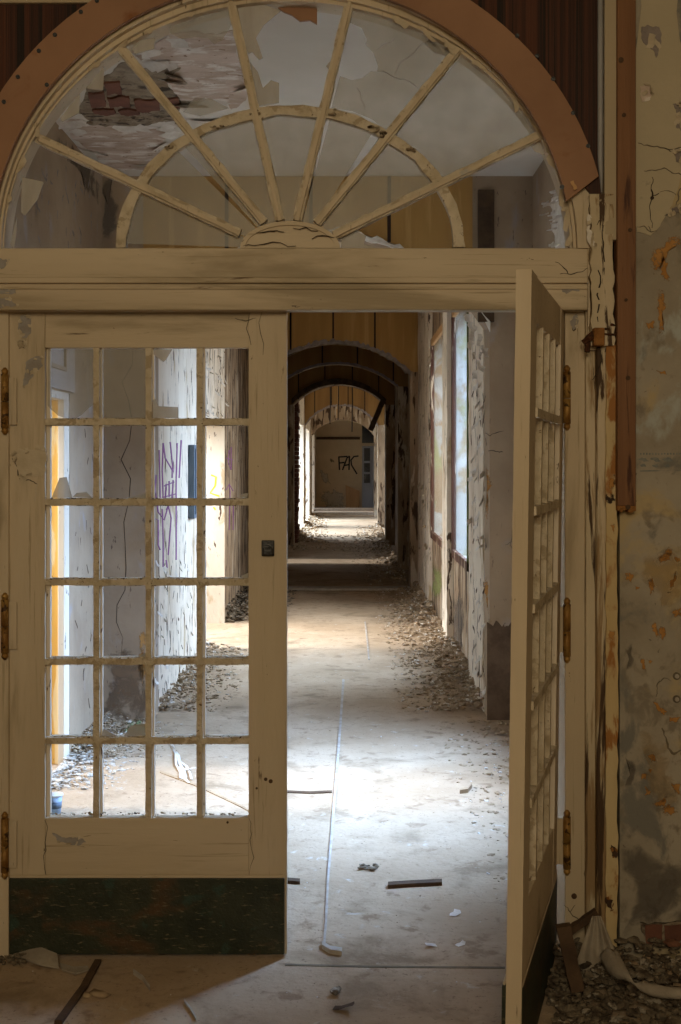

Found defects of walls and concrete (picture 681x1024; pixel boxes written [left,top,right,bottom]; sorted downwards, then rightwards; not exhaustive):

peeling [57,27,247,174]
peeling [357,231,404,248]
crack [639,143,681,232]
crack [116,353,133,652]
flaking render [464,312,511,720]